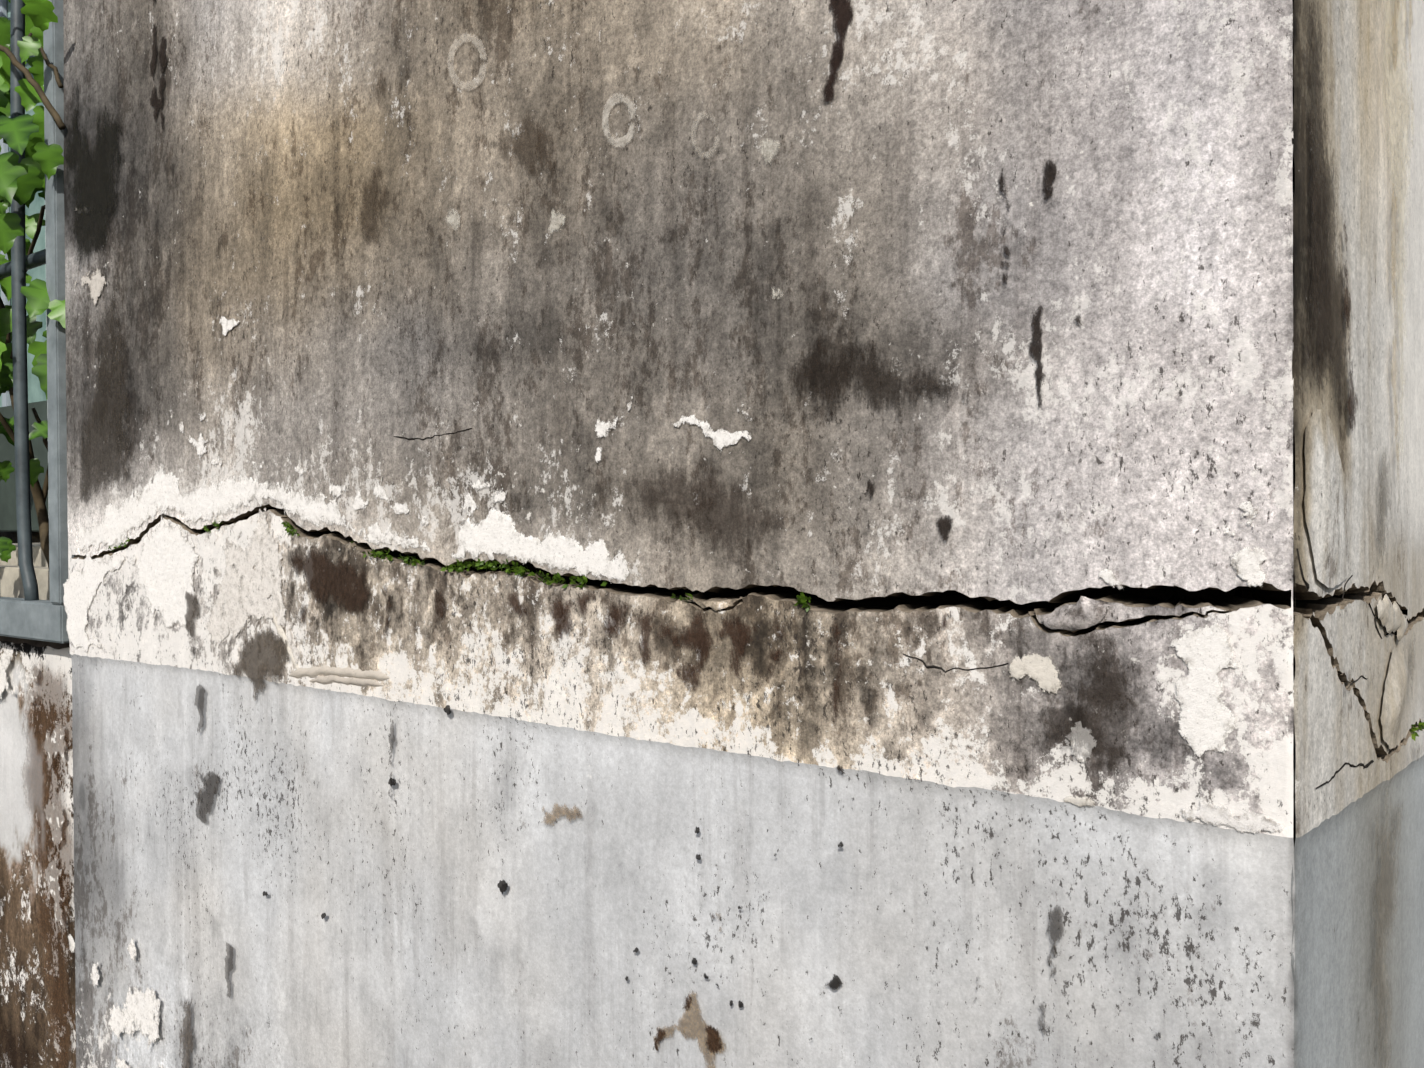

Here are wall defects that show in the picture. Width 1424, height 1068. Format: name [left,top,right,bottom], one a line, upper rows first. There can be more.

damp [1028,305,1046,407]
peeling [673,404,752,452]
damp [185,592,199,653]
peeling [0,412,433,700]
damp [291,547,391,634]
peeling [452,478,629,582]
damp [550,590,755,692]
crack [72,504,1424,789]
peeling [1008,653,1062,695]
flaking render [1042,596,1110,630]
peeling [1170,624,1240,757]
damp [44,797,75,953]